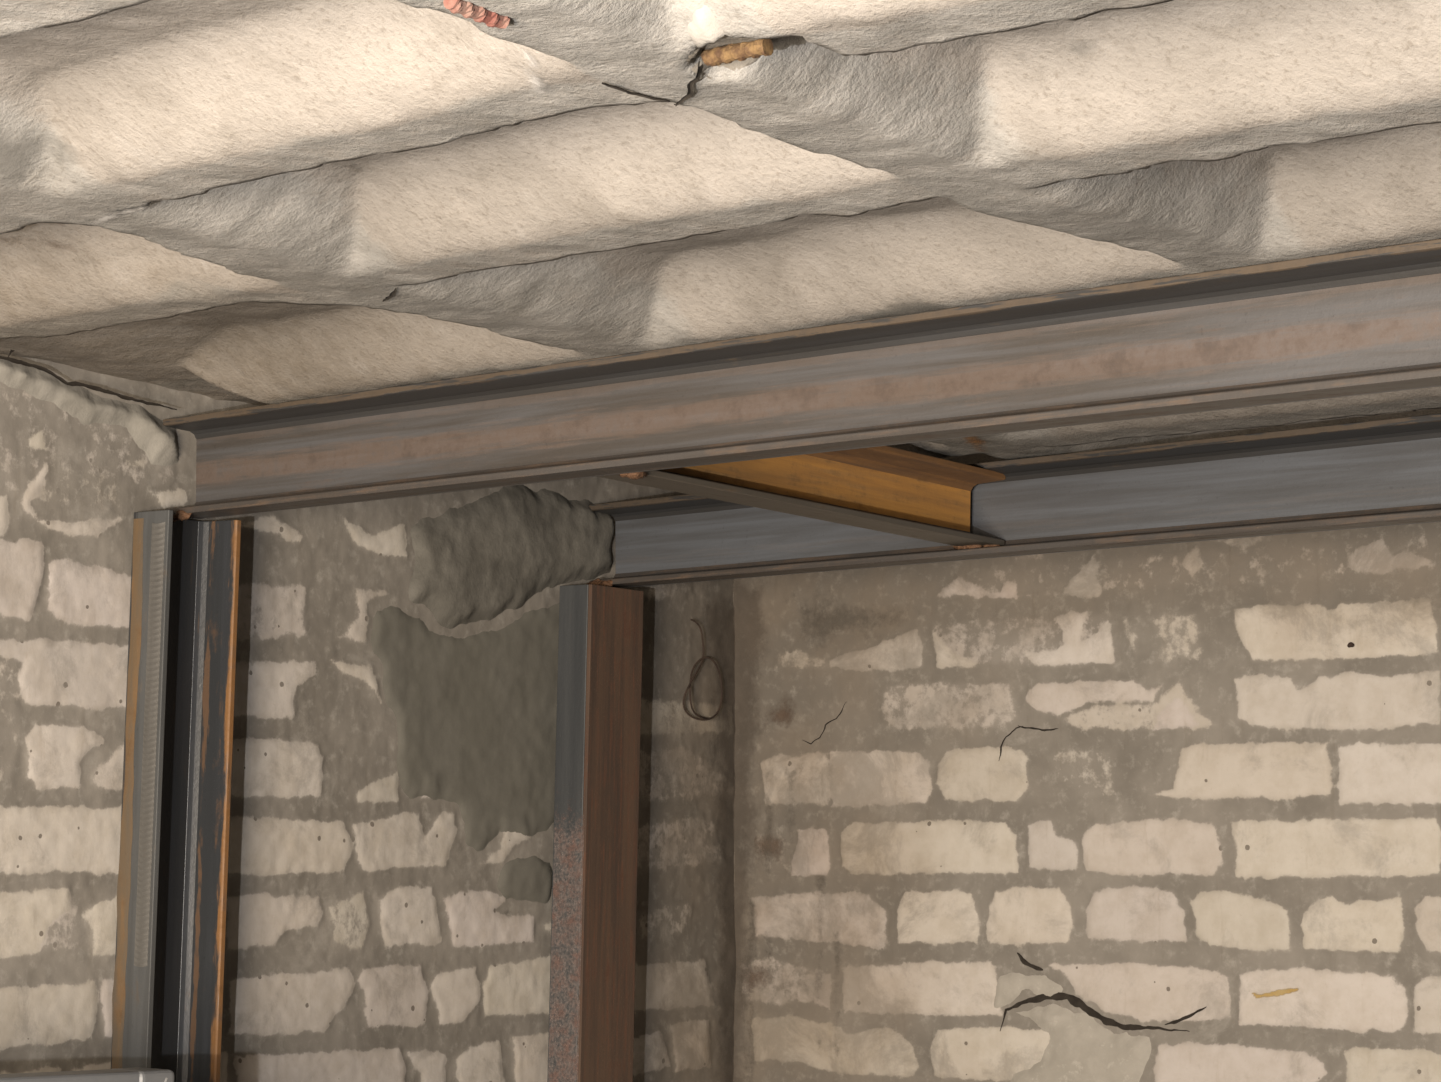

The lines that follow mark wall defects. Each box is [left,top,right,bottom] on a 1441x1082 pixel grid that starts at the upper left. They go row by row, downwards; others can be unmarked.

rust [443,0,510,29]
crack [602,57,703,106]
crack [382,288,396,302]
crack [0,350,177,410]
crack [1000,952,1206,1032]